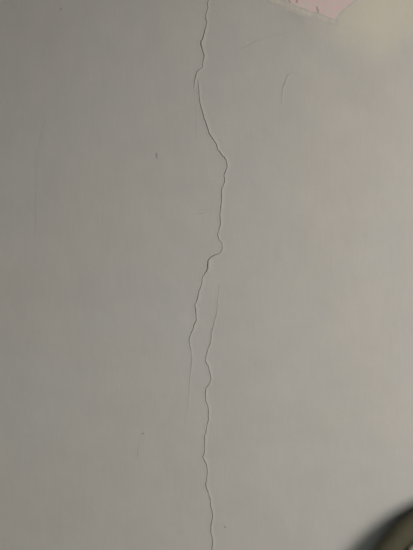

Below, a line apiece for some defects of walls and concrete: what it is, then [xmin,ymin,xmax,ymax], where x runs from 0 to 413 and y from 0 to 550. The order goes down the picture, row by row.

crack [184,0,231,550]